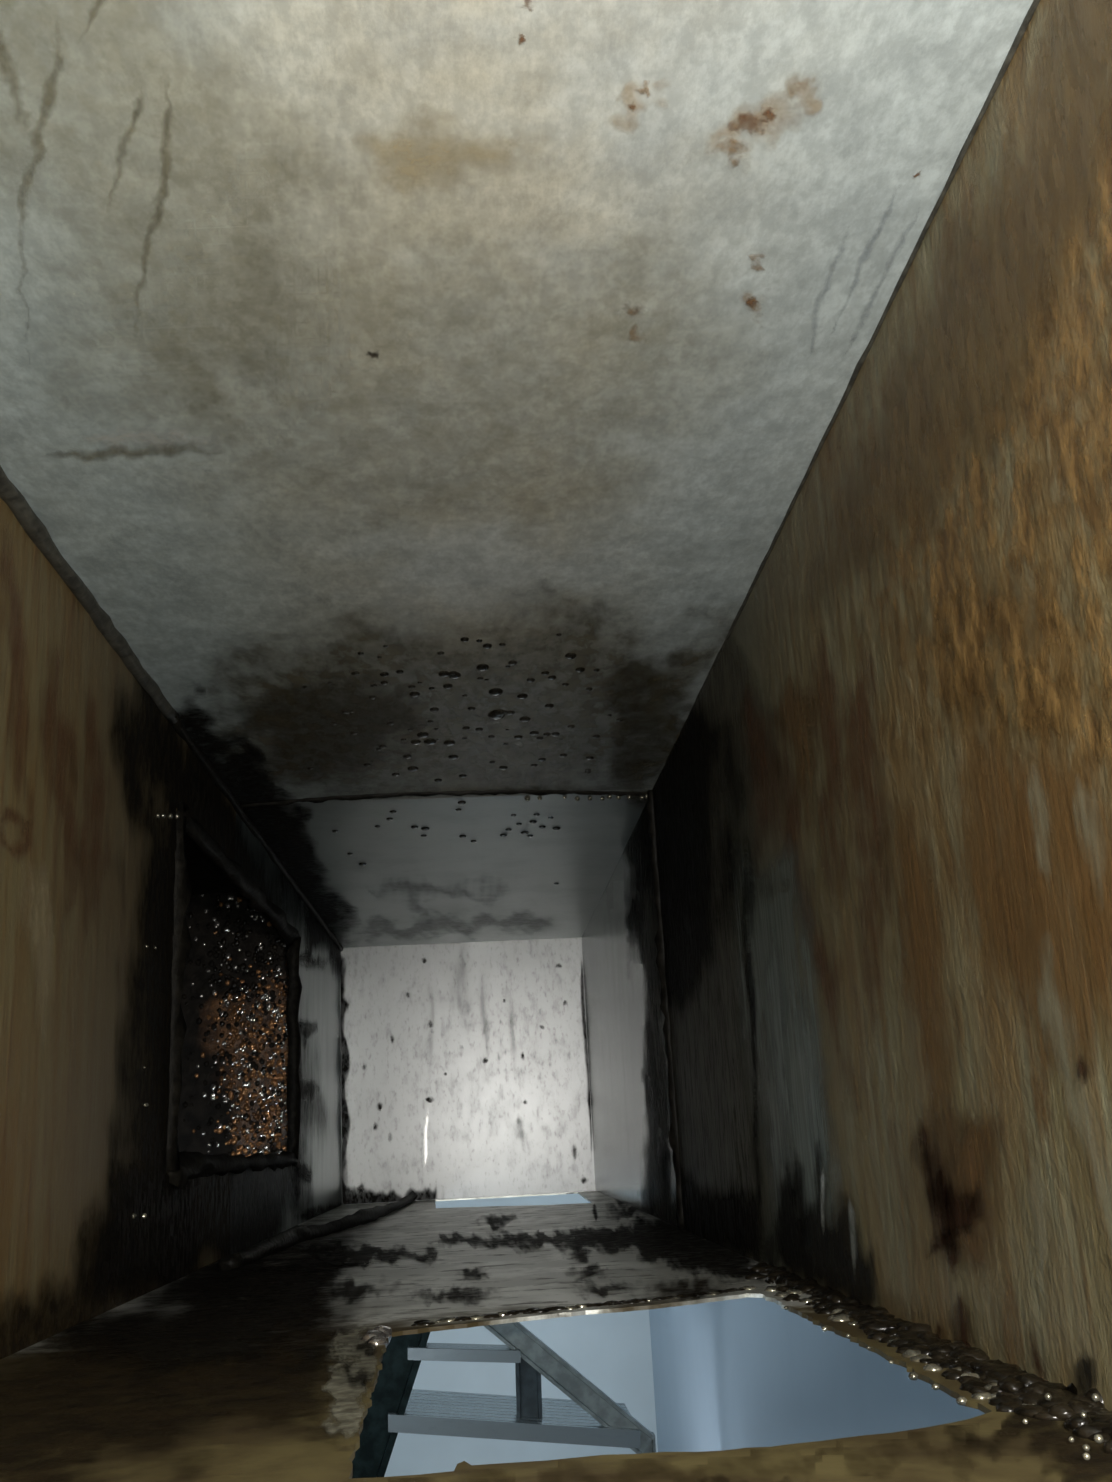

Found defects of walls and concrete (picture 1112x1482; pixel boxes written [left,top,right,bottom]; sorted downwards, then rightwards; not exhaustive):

corrosion [730,110,775,152]